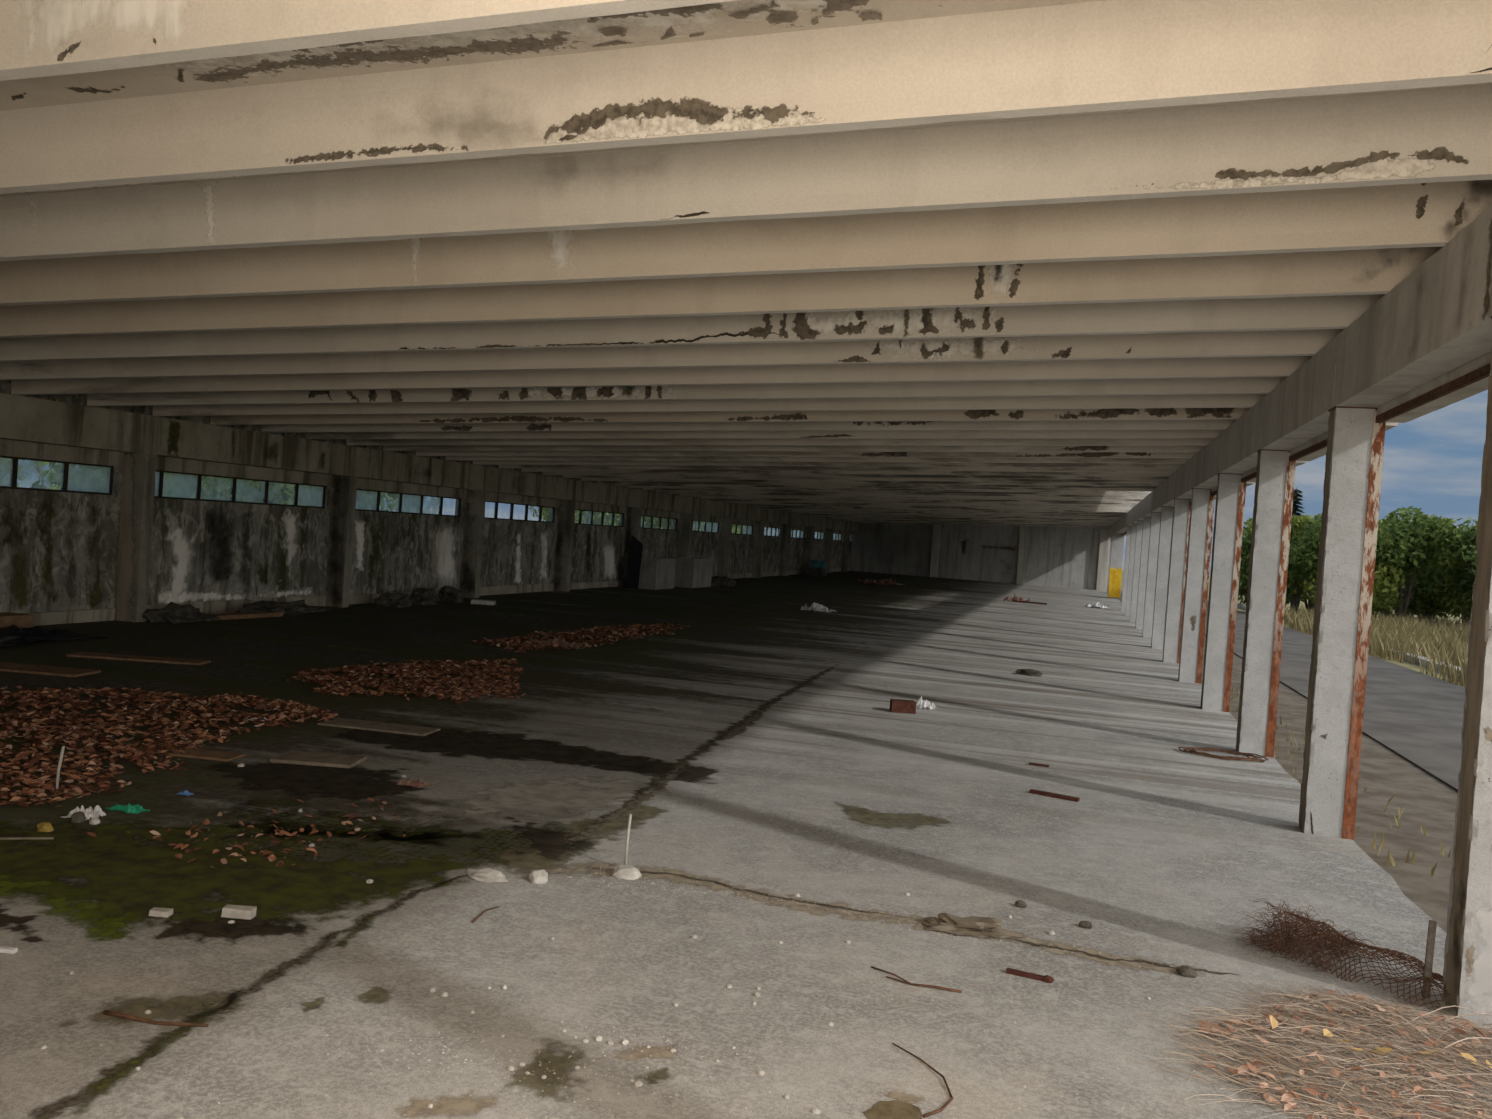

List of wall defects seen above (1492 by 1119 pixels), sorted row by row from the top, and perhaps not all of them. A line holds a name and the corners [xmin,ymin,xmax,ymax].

damp [23,0,186,53]
peeling [178,0,882,83]
peeling [67,86,124,94]
spalling [544,96,827,145]
spalling [1136,147,1469,190]
damp [159,511,311,604]
damp [328,478,364,603]
damp [435,528,475,592]
crack [30,875,467,1119]